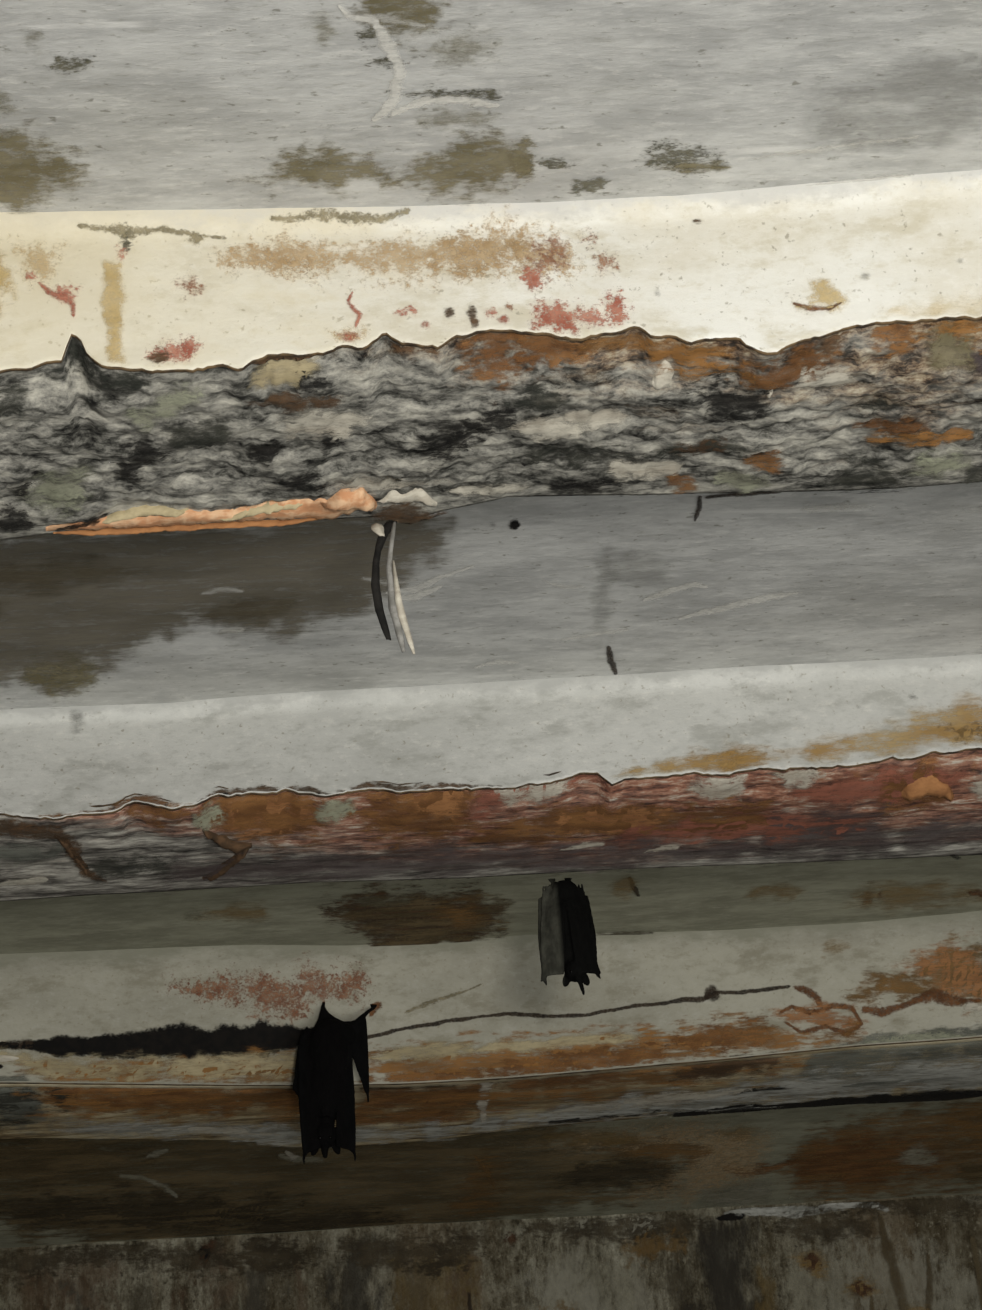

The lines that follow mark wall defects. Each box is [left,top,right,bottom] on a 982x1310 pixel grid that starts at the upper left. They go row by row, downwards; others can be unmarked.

water stain [355,0,450,69]
water stain [0,131,85,211]
water stain [266,132,611,200]
water stain [644,138,730,177]
corrosion [147,336,204,363]
corrosion [445,304,513,327]
corrosion [512,230,633,334]
spalling [0,246,982,654]
water stain [0,516,454,697]
crack [367,984,821,1039]
corrosion [354,937,982,1126]
corrosion [13,1047,300,1129]